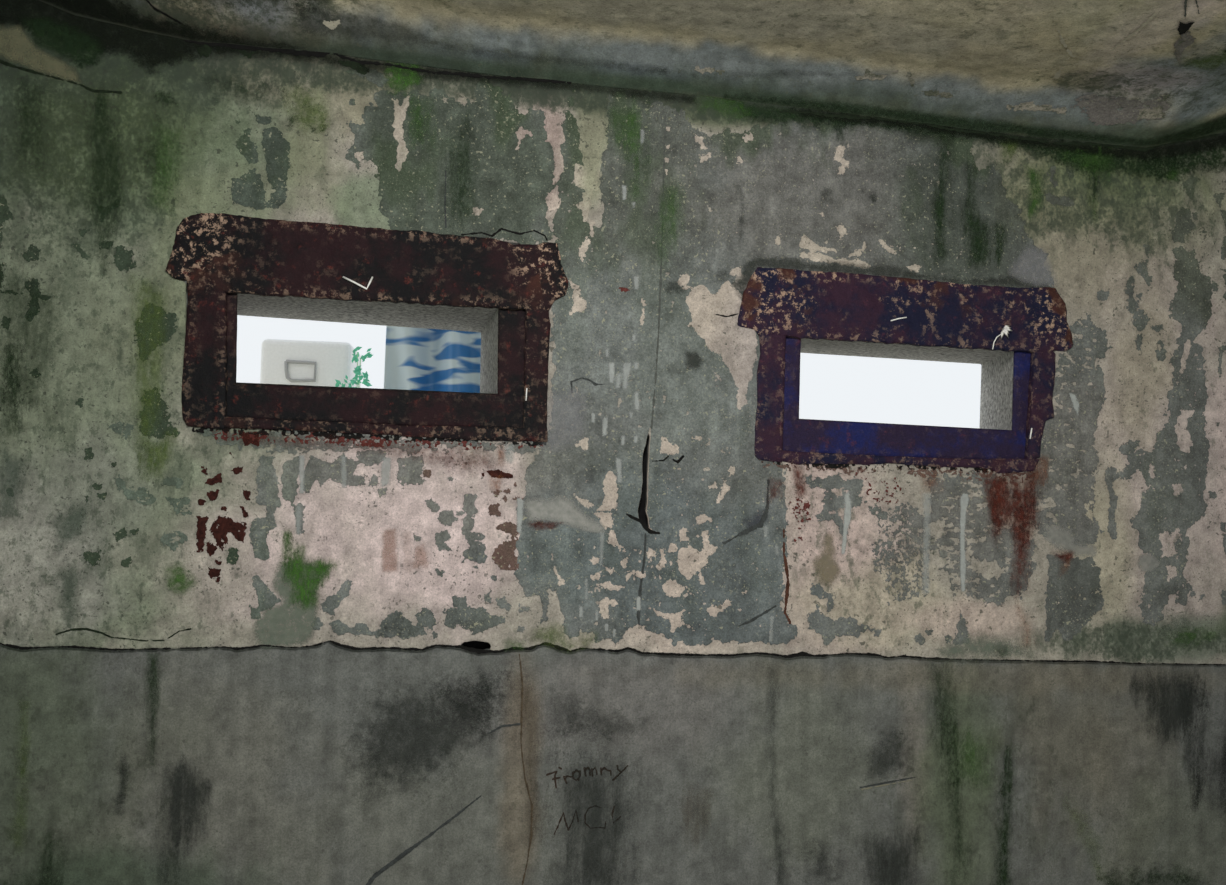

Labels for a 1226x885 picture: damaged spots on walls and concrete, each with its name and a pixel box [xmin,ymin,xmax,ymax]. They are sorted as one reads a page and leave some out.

crack [146,0,572,84]
crack [444,164,548,241]
peeling [85,462,192,516]
corrosion [196,452,251,582]
corrosion [238,429,259,447]
crack [570,378,603,394]
crack [626,115,684,625]
peeling [107,66,1226,649]
crack [722,479,791,627]
corrosion [990,477,1035,574]
crack [0,628,1225,885]
damp [1131,674,1202,797]